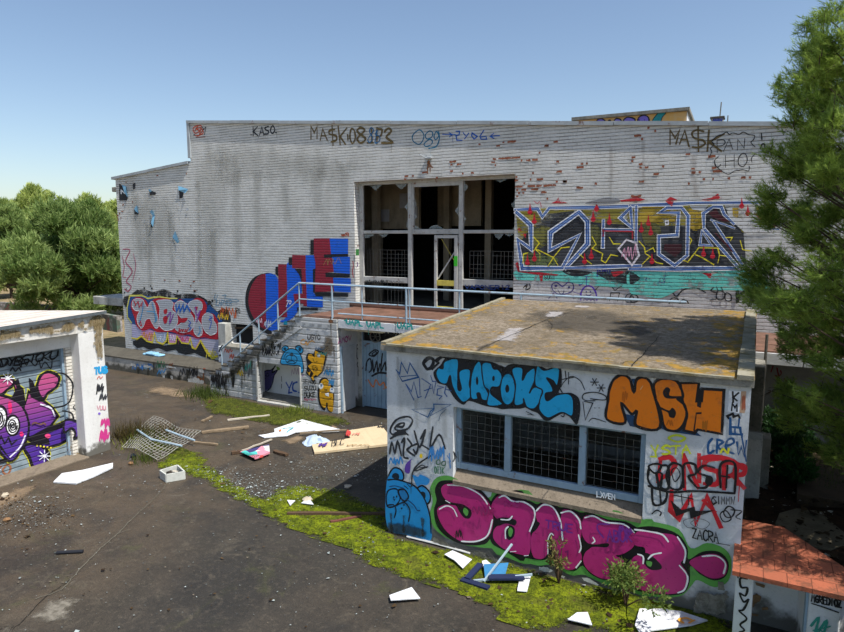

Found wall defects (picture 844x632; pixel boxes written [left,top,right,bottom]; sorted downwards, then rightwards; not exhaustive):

peeling [515,161,567,200]
damp [497,328,522,340]